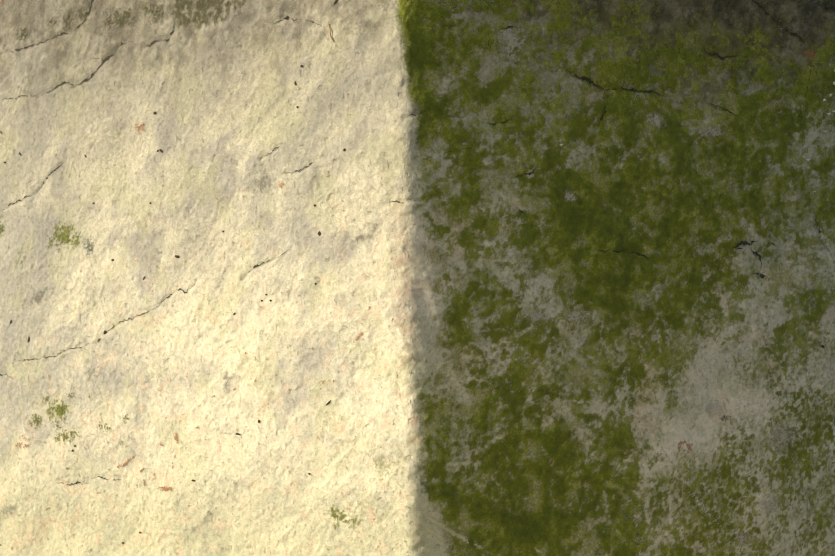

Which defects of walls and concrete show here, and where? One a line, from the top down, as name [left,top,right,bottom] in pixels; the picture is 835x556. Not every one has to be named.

crack [10,0,93,52]
crack [2,22,175,100]
crack [566,69,664,126]
damp [512,0,835,105]
damp [733,241,765,278]
crack [0,280,198,379]